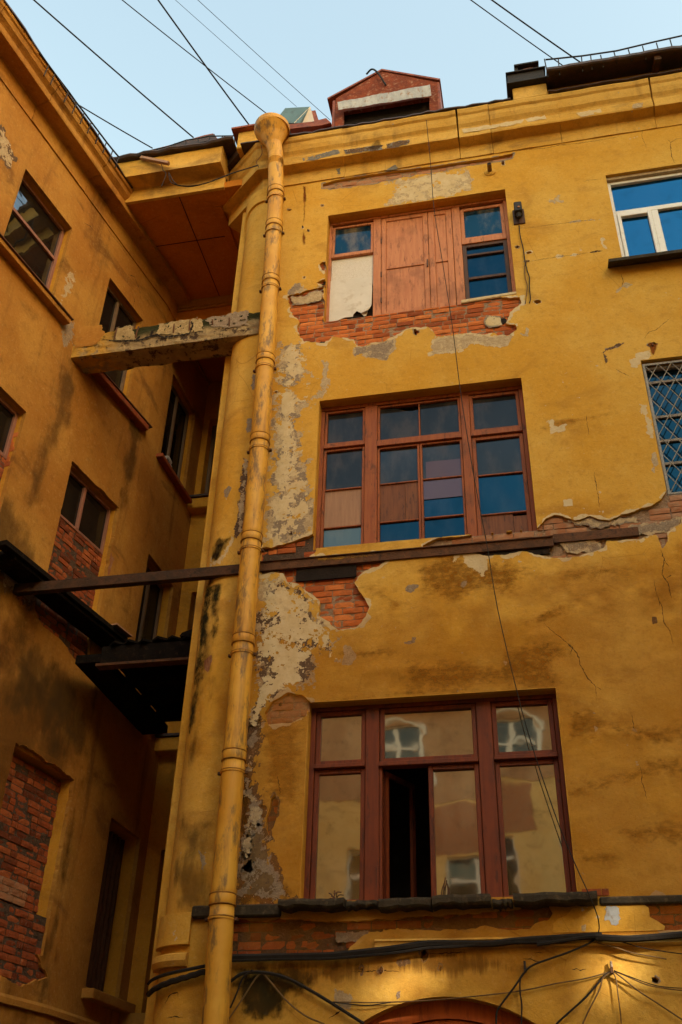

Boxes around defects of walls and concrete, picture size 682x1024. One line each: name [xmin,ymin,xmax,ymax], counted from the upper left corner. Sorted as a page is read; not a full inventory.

peeling [0,124,18,169]
peeling [321,152,515,206]
peeling [60,322,139,348]
spalling [157,310,249,335]
flaking render [421,492,682,577]
flaking render [236,261,538,905]
water stain [420,558,513,597]
crack [654,551,672,636]
water stain [190,580,220,727]
water stain [409,643,560,693]
crack [544,623,600,700]